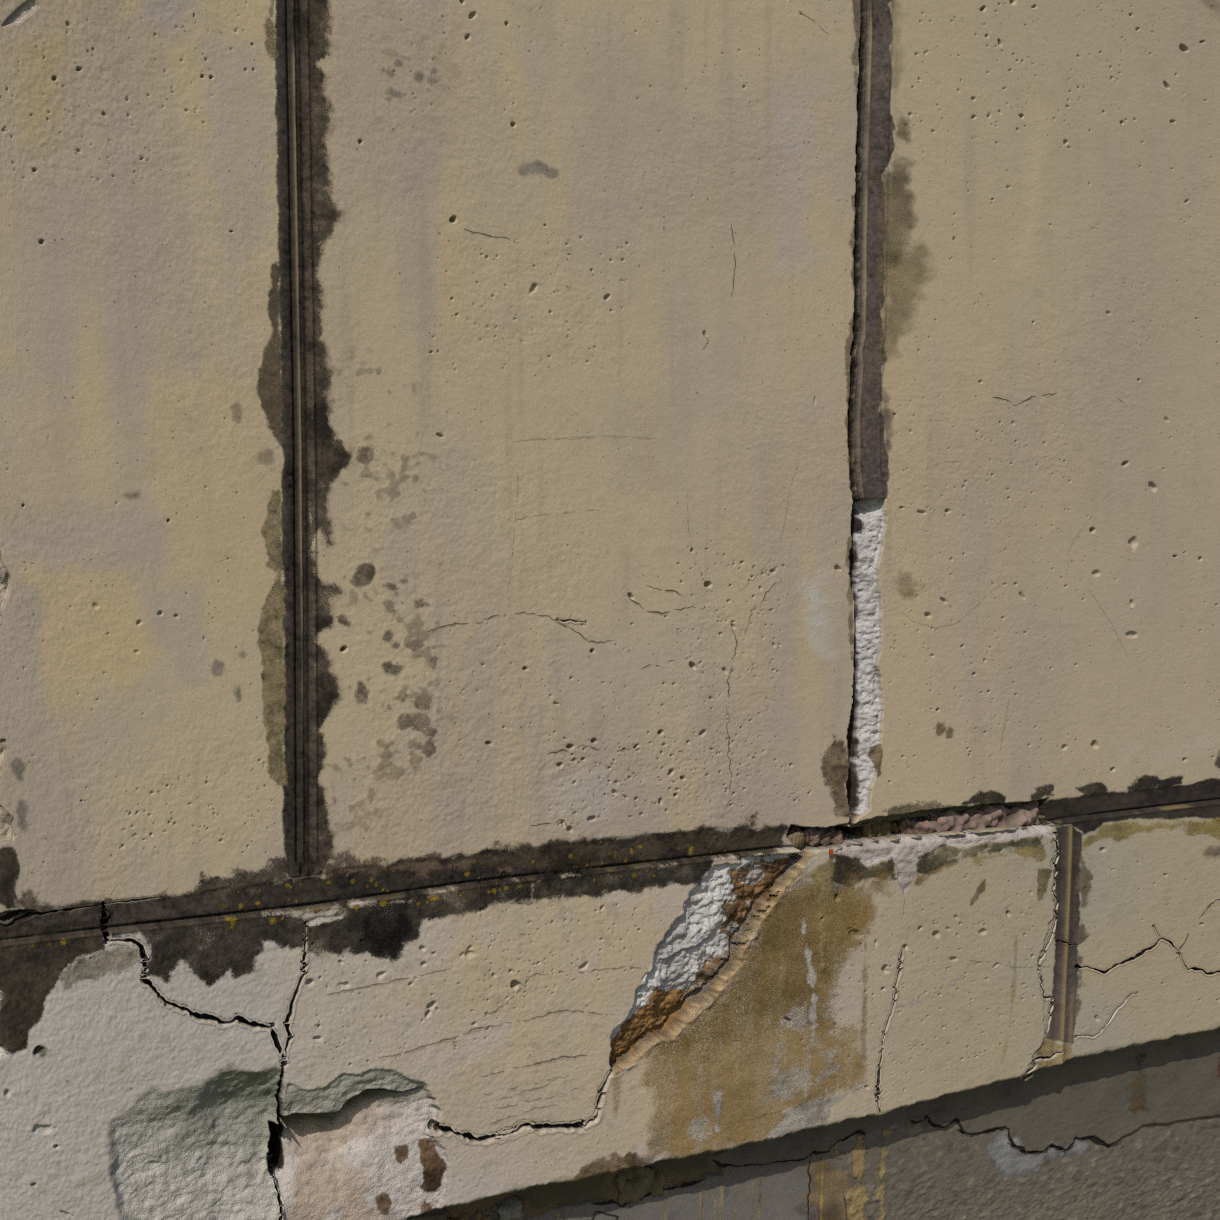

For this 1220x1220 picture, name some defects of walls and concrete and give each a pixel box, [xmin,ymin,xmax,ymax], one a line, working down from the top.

leakage [874,164,926,353]
leakage [0,0,783,1054]
spalling [836,498,1054,894]
crack [0,895,449,1125]
crack [268,1168,285,1220]
spalling [110,1069,449,1220]
crack [433,1055,616,1147]
spalling [609,849,814,1075]
leakage [767,854,897,1140]
crack [591,947,1122,1220]
leakage [915,836,1051,900]
crack [1020,833,1220,1081]